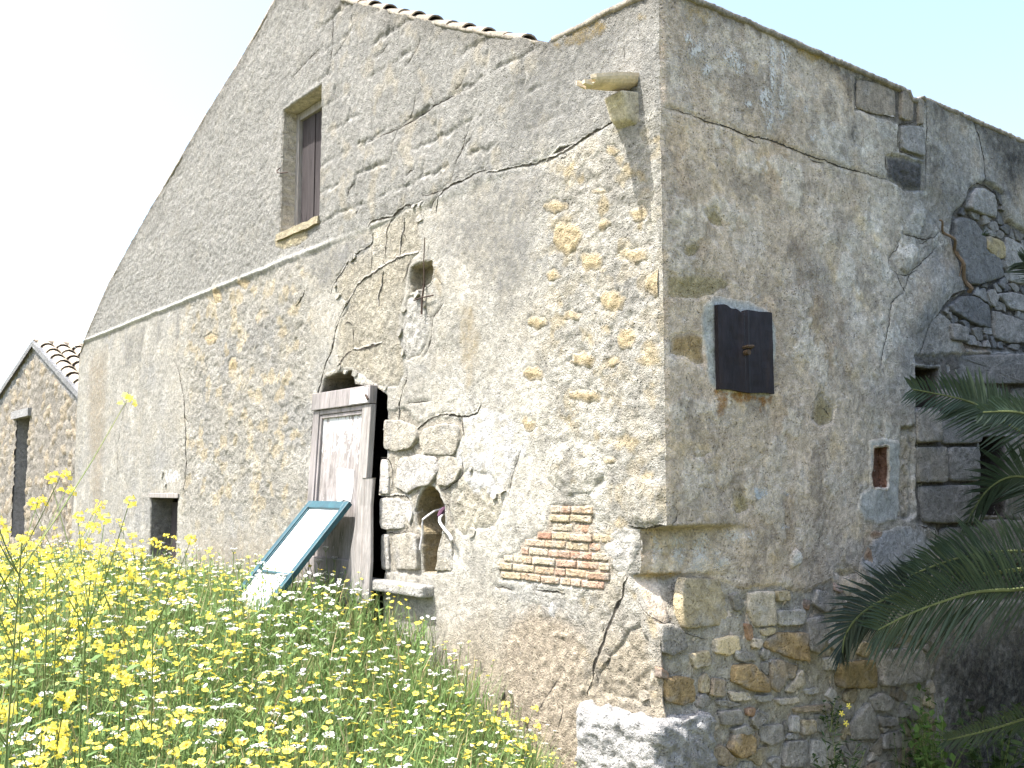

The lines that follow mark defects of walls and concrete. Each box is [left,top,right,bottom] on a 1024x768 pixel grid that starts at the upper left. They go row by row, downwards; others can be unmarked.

crack [662,101,928,179]
crack [317,120,612,393]
crack [881,123,998,366]
crack [383,279,481,434]
crack [915,286,1019,361]
spalling [450,467,507,538]
flaking render [497,505,614,591]
crack [586,576,704,694]